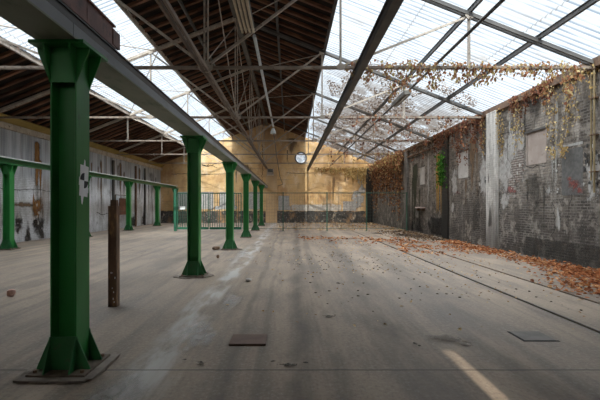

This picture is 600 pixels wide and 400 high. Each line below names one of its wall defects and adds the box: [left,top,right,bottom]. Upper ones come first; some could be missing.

rust [32,141,43,218]
peeling [479,131,526,226]
peeling [583,143,600,200]
water stain [15,218,44,241]